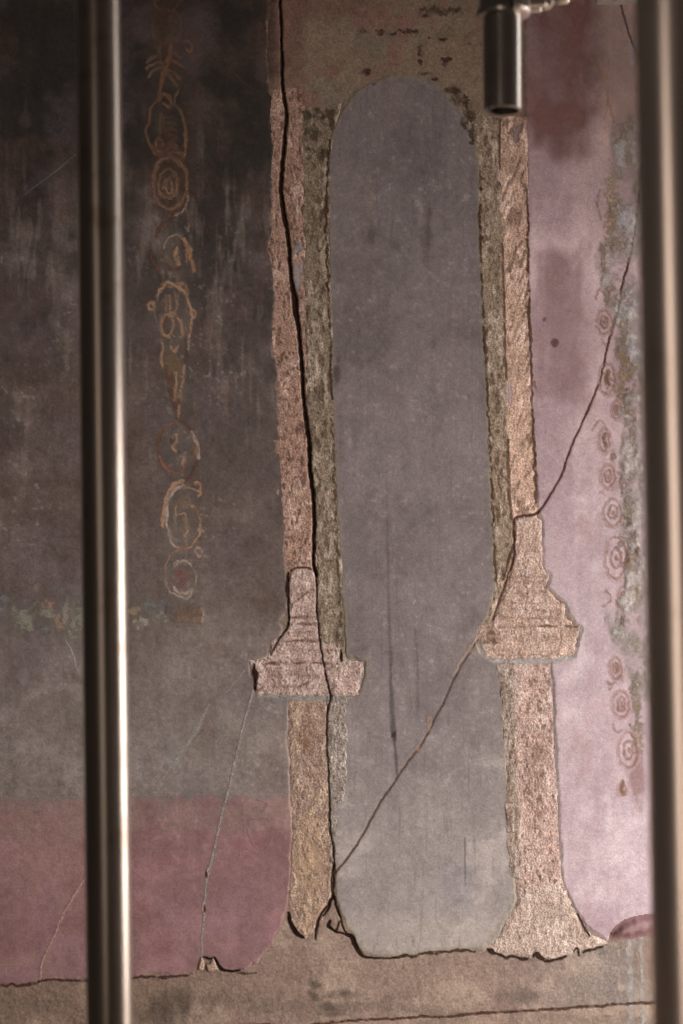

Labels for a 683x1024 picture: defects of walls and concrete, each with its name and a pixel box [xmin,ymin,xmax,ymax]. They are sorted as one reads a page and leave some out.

flaking render [271,103,347,666]
crack [278,0,476,959]
flaking render [526,189,538,503]
crack [492,242,633,620]
crack [201,670,259,958]
flaking render [287,911,305,939]
flaking render [323,694,348,864]
flaking render [397,913,603,963]
flaking render [496,659,522,880]